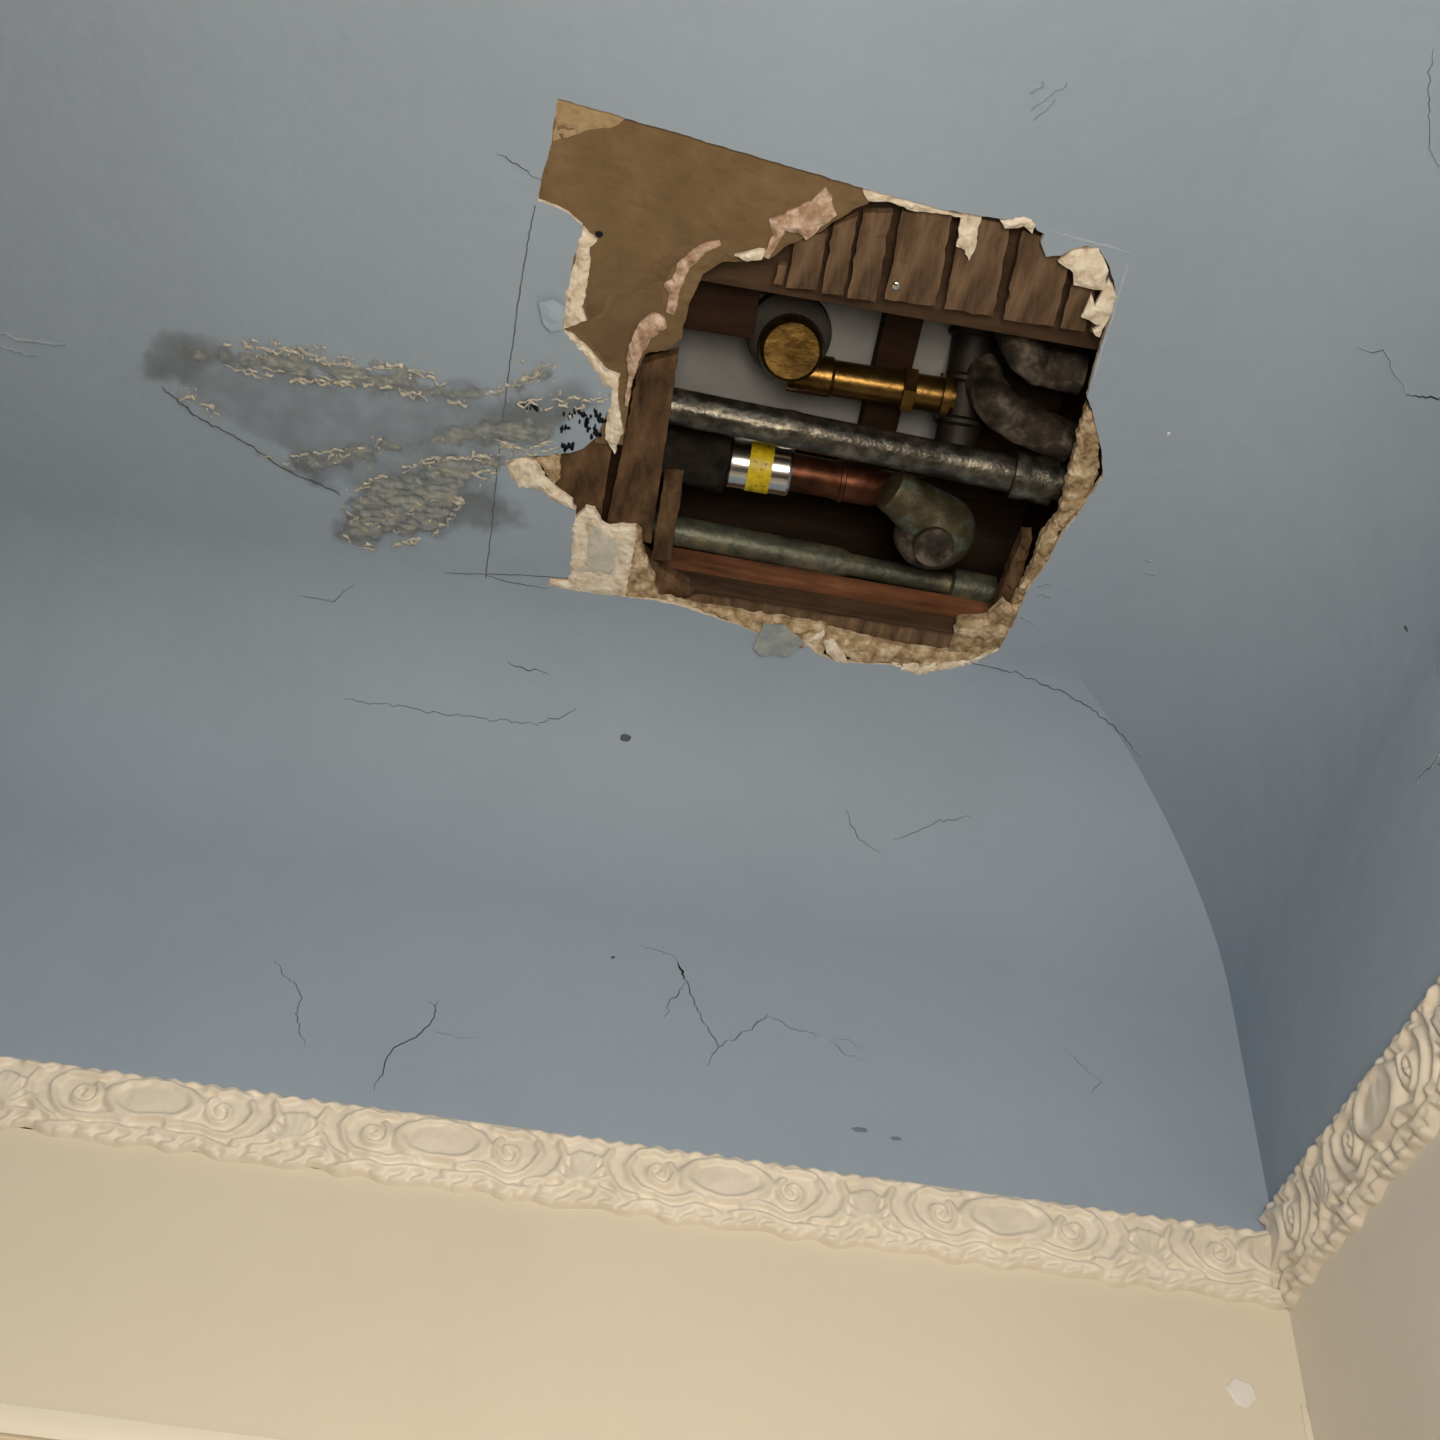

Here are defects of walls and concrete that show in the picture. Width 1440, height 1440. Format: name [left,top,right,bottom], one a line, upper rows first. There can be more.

crack [1427,49,1440,167]
spalling [1058,247,1117,337]
leakage [560,408,607,453]
spalling [162,99,1100,675]
crack [846,809,970,854]
crack [274,960,306,1046]
crack [373,1000,482,1091]
crack [640,945,868,1066]